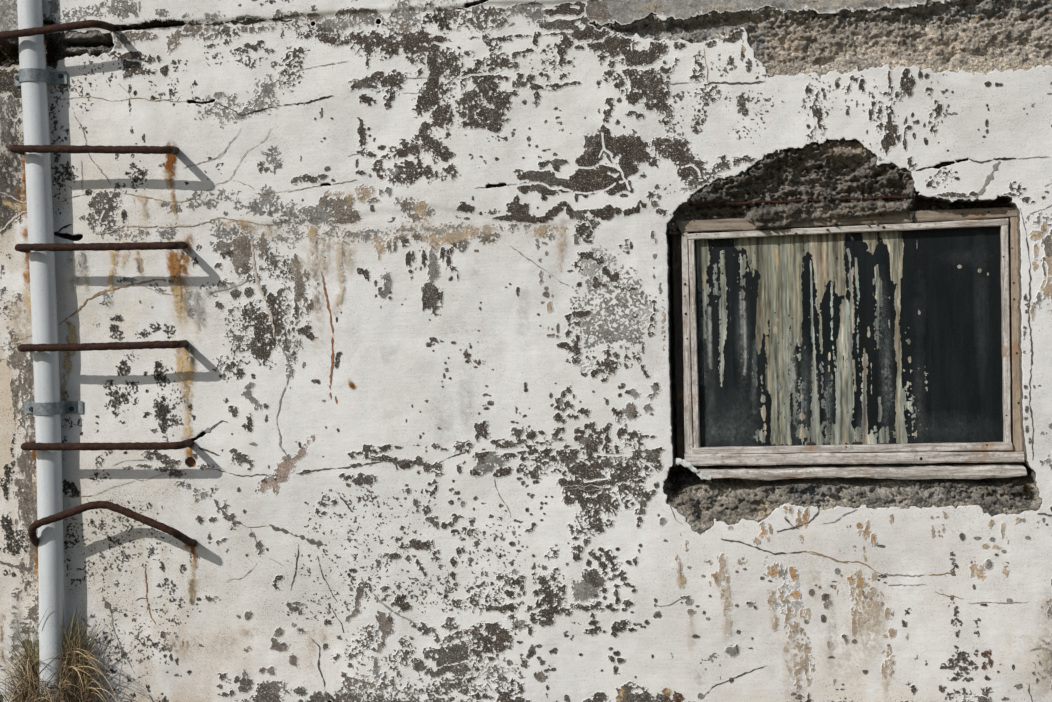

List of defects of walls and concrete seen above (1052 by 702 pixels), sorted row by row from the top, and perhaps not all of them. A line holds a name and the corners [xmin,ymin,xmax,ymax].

peeling [710,54,737,77]
peeling [0,0,25,237]
corrosion [164,143,176,218]
corrosion [167,236,191,318]
crack [56,83,382,512]
peeling [426,330,494,388]
corrosion [176,347,194,457]
peeling [524,496,553,533]
crack [721,509,1026,604]
peeling [968,521,1009,590]
water stain [719,558,731,635]
peeling [607,647,626,675]